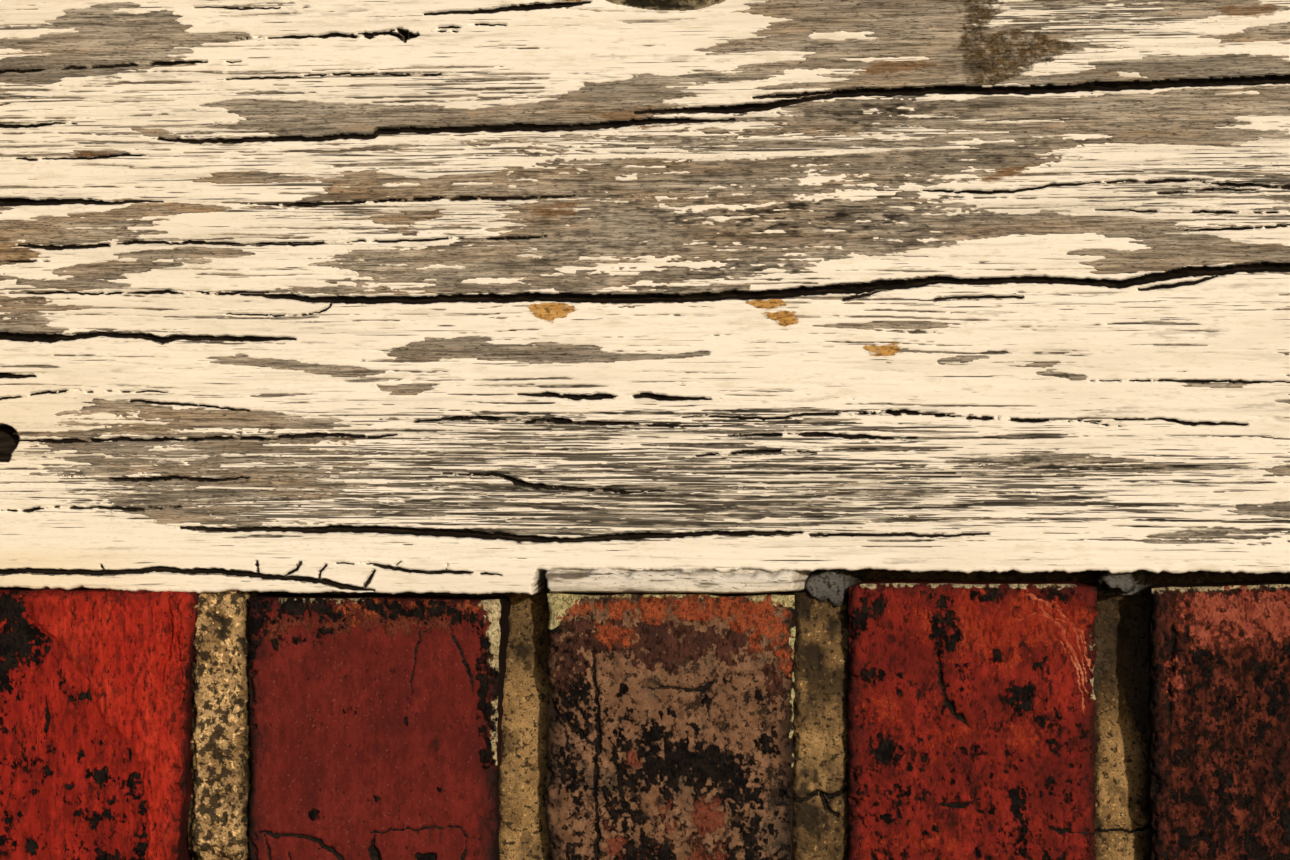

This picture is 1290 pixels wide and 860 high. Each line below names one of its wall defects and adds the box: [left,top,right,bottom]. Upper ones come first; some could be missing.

peeling [0,3,249,106]
crack [0,74,1290,161]
peeling [192,0,1290,297]
crack [0,198,164,206]
crack [920,179,1290,231]
peeling [0,203,255,334]
crack [0,235,1290,344]
peeling [11,398,395,528]
peeling [208,354,434,395]
peeling [387,336,710,363]
crack [0,373,1248,457]
crack [0,476,989,591]